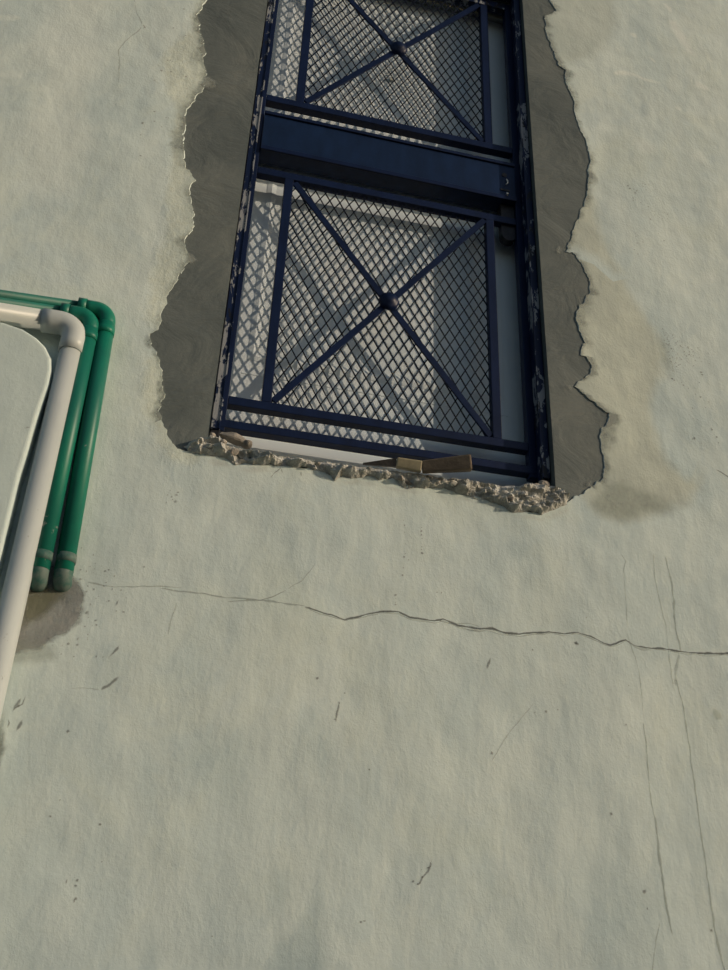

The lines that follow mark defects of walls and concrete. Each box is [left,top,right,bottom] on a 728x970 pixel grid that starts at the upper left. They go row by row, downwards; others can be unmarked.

water stain [558,144,728,532]
water stain [136,350,212,470]
spalling [185,435,570,515]
crack [307,607,728,656]